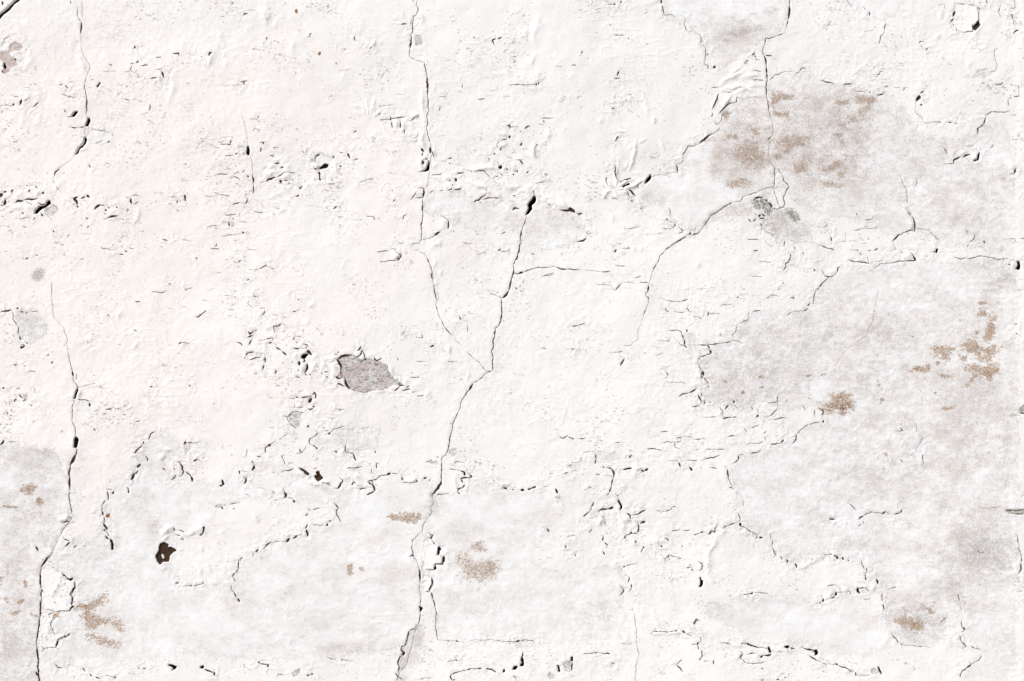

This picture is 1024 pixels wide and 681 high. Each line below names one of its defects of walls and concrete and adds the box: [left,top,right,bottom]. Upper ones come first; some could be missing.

crack [0,0,20,19]
crack [53,1,91,189]
crack [242,116,266,209]
peeling [237,295,423,396]
crack [395,0,834,680]
rust [910,302,1003,388]
rust [810,391,855,415]
crack [35,284,95,681]
peeling [0,391,635,681]
rust [387,512,421,524]
rust [458,542,500,582]
rust [73,593,125,648]